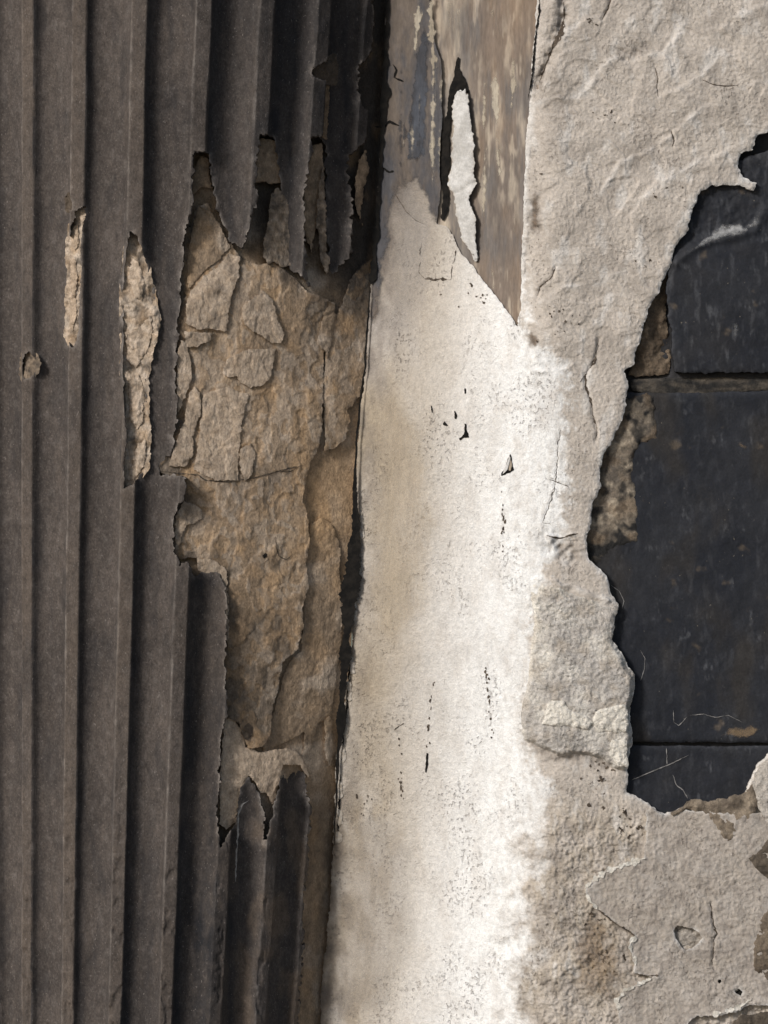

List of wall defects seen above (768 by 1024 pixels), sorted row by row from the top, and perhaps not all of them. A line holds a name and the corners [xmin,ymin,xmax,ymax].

peeling [429,0,544,326]
spalling [19,352,41,382]
spalling [63,207,90,348]
spalling [628,273,671,377]
spalling [119,0,387,1024]
spalling [586,393,657,564]
crack [709,903,717,965]